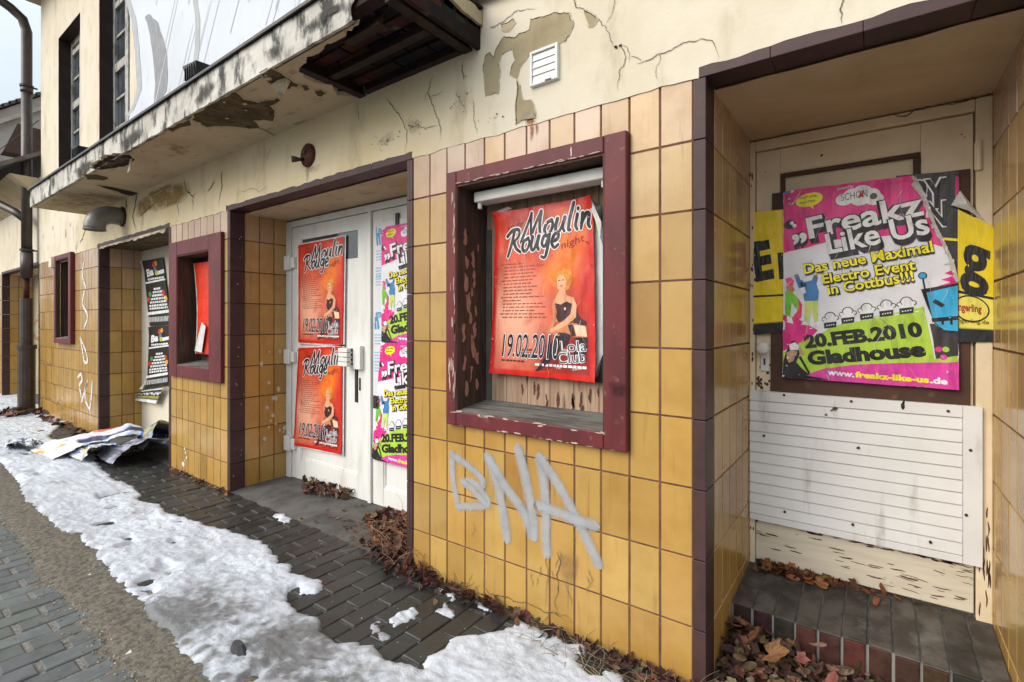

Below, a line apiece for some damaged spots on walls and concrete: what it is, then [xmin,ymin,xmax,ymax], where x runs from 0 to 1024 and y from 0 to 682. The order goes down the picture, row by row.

leakage [122,130,140,150]
leakage [195,83,213,101]
spalling [164,68,327,133]
crack [389,66,477,149]
peeling [483,9,599,125]
crack [574,0,718,84]
spalling [81,153,173,198]
leakage [138,185,183,215]
crack [177,173,266,215]
peeling [448,171,509,426]